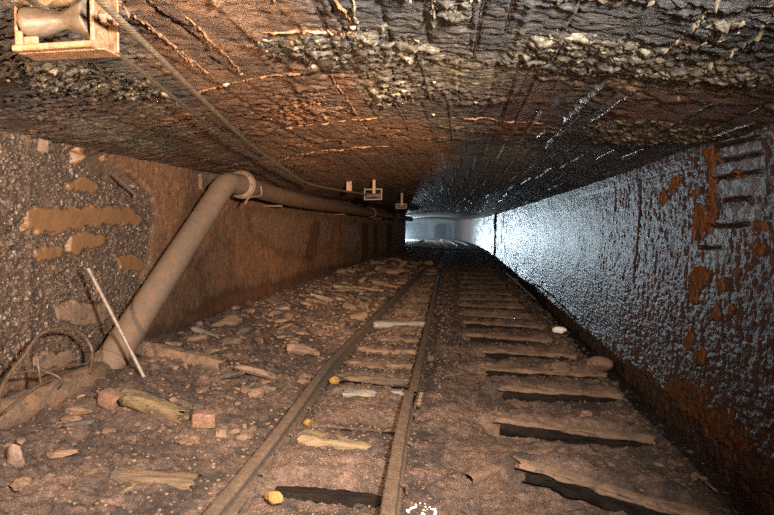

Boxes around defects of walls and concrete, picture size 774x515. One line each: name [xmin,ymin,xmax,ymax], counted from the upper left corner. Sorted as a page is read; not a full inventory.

spalling [245,27,470,109]
spalling [510,28,774,91]
spalling [683,10,750,49]
peeling [686,252,741,304]